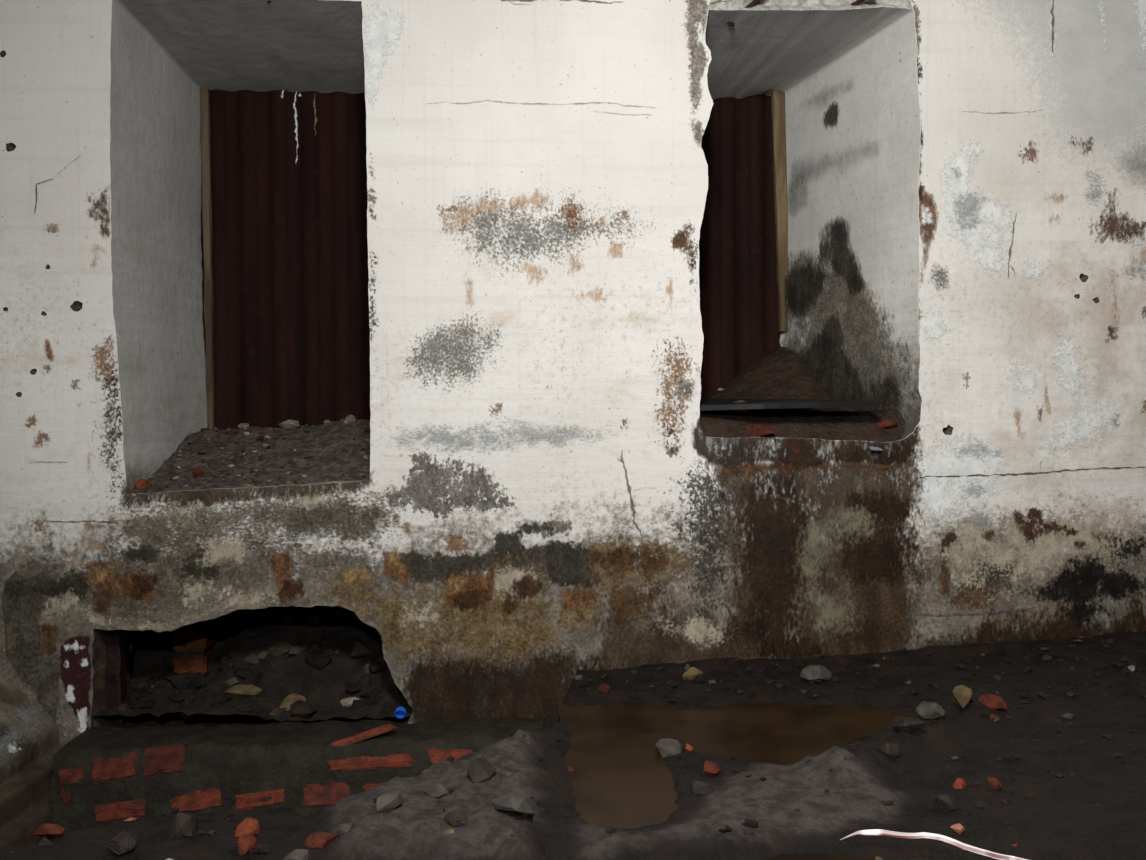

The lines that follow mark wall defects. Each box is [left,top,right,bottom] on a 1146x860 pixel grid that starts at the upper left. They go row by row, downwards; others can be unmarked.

peeling [1047,0,1058,57]
spalling [685,0,923,143]
corrosion [437,196,547,231]
corrosion [555,203,586,234]
corrosion [1091,192,1146,254]
damp [783,217,912,411]
damp [407,315,500,387]
corrosion [653,337,698,457]
crack [914,466,1143,478]
damp [19,362,1146,727]